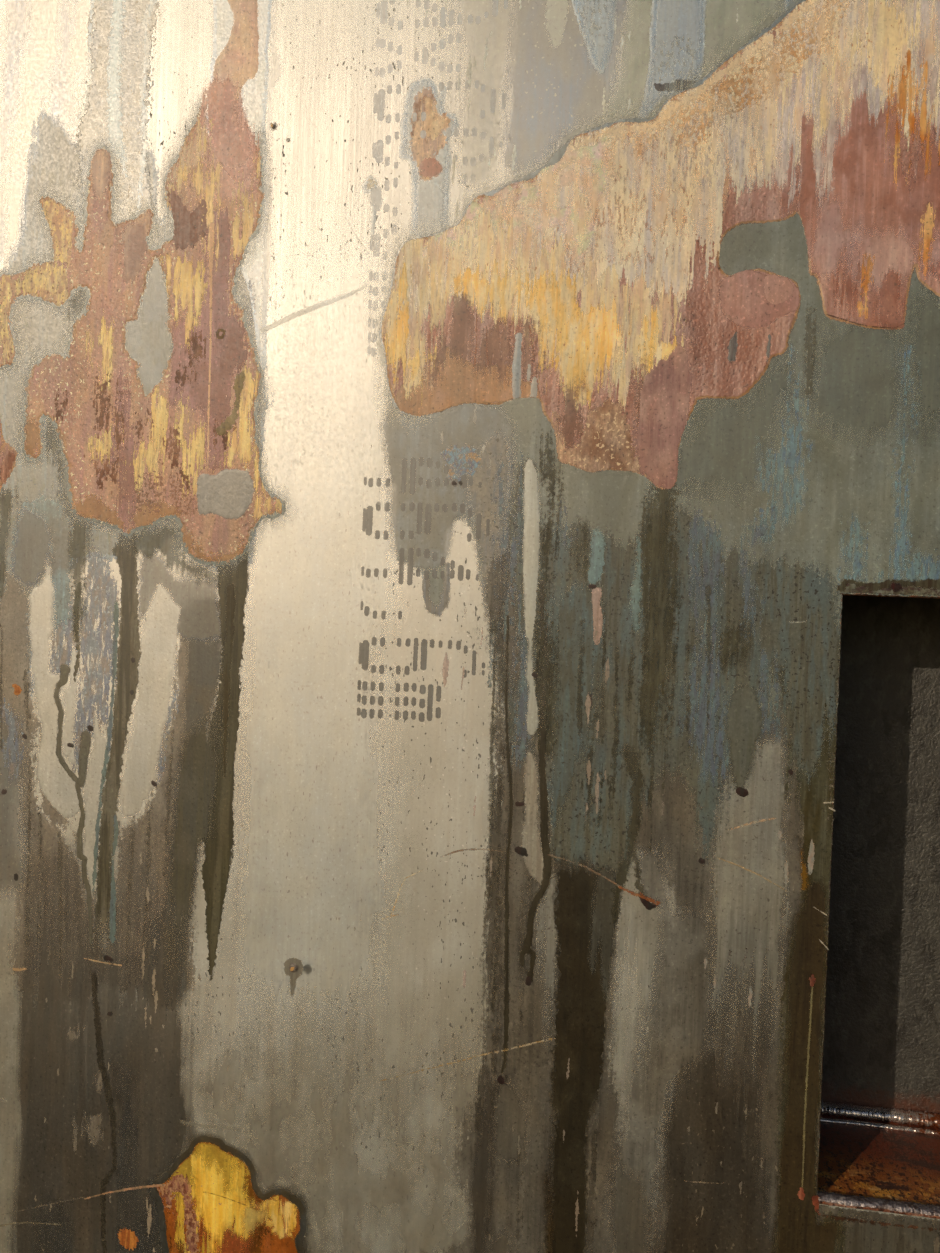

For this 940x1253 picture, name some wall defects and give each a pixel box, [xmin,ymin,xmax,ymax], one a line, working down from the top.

leakage [0,0,384,1253]
leakage [245,213,940,1253]
rust [797,1188,937,1231]